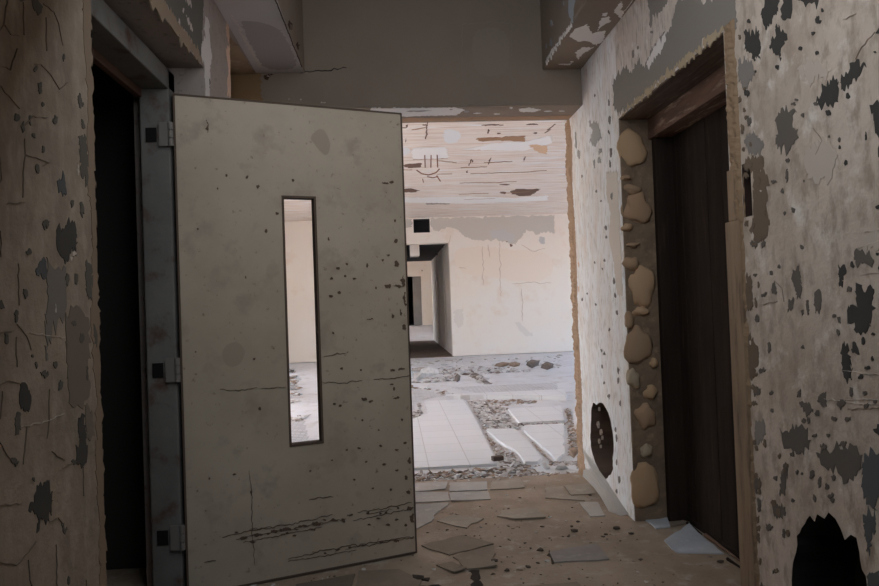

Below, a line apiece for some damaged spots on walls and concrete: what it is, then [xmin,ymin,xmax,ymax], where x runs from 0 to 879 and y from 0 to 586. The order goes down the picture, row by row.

peeling [148,0,212,96]
peeling [545,0,624,65]
peeling [813,59,866,116]
peeling [865,100,879,157]
spalling [42,0,107,586]
peeling [589,0,824,586]
peeling [14,382,32,435]
spalling [772,248,879,586]
peeling [28,477,54,533]